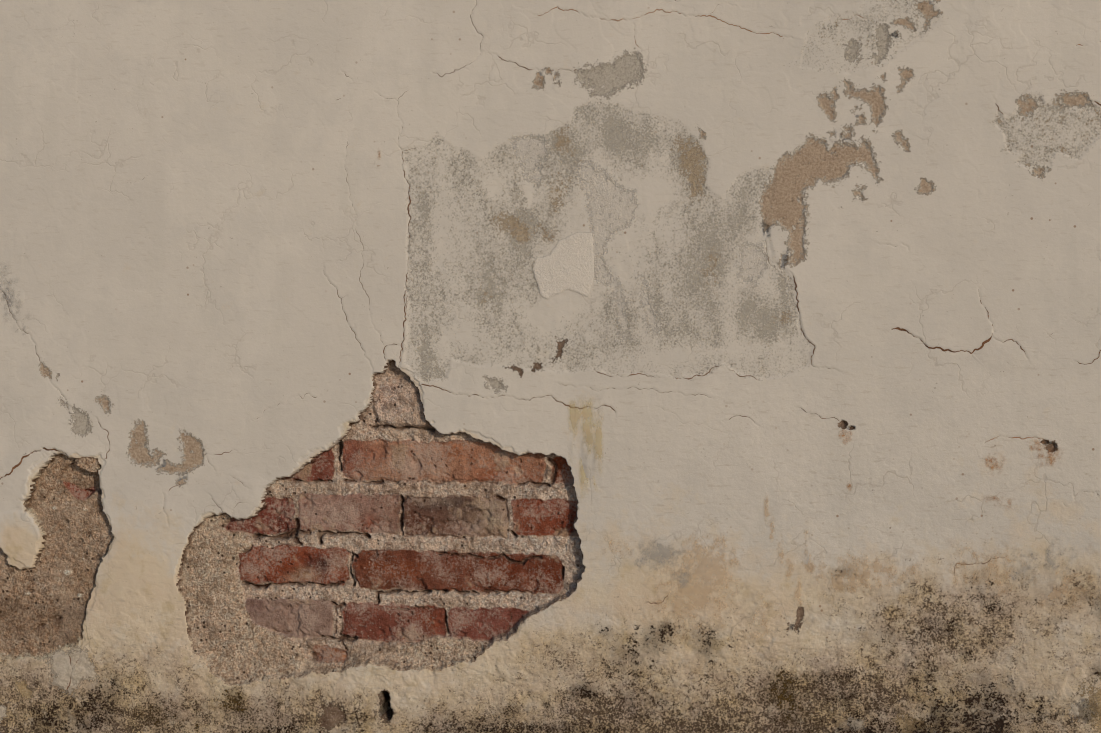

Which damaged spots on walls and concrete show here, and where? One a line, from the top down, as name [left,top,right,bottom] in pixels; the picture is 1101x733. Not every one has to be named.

crack [437,4,532,77]
crack [538,7,782,46]
flaking render [997,89,1099,179]
peeling [466,0,943,346]
crack [892,300,1025,354]
flaking render [126,419,206,488]
flaking render [176,187,585,686]
flaking render [0,454,114,697]
leakage [602,623,674,677]
leakage [31,680,207,733]
leakage [760,668,851,722]
leakage [821,660,1051,733]